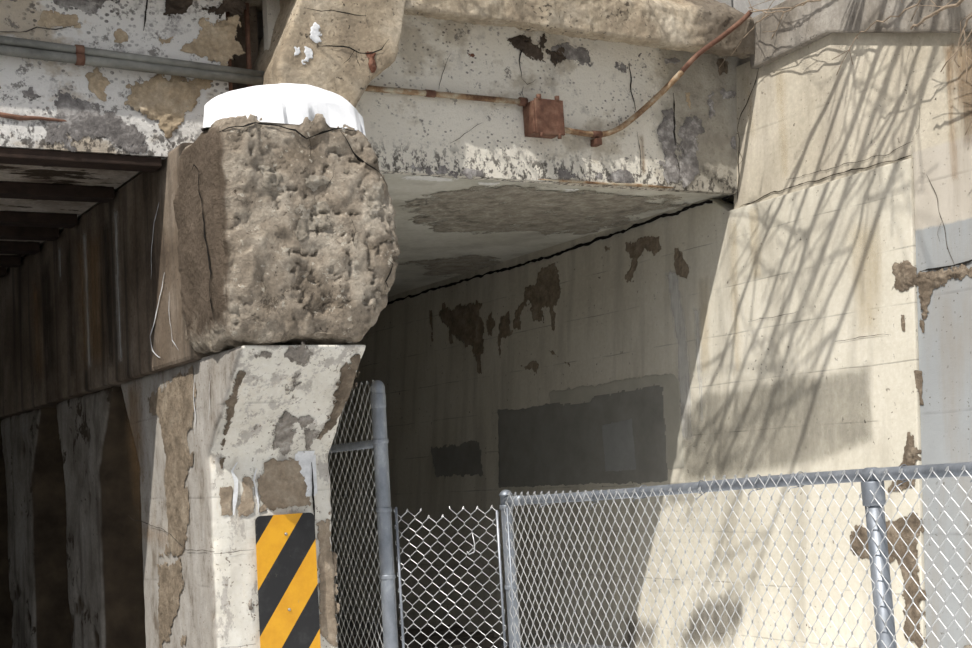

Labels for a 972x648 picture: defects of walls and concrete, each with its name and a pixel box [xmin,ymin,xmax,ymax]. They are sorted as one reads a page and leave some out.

spalling [163,0,247,66]
spalling [507,33,593,68]
peeling [0,67,149,154]
crack [192,164,214,318]
crack [385,69,920,305]
crack [920,176,972,272]
spalling [892,260,972,333]
peeling [219,354,361,517]
spalling [900,432,922,466]
peeling [148,366,196,648]
spalling [850,525,869,559]
spalling [886,512,927,648]